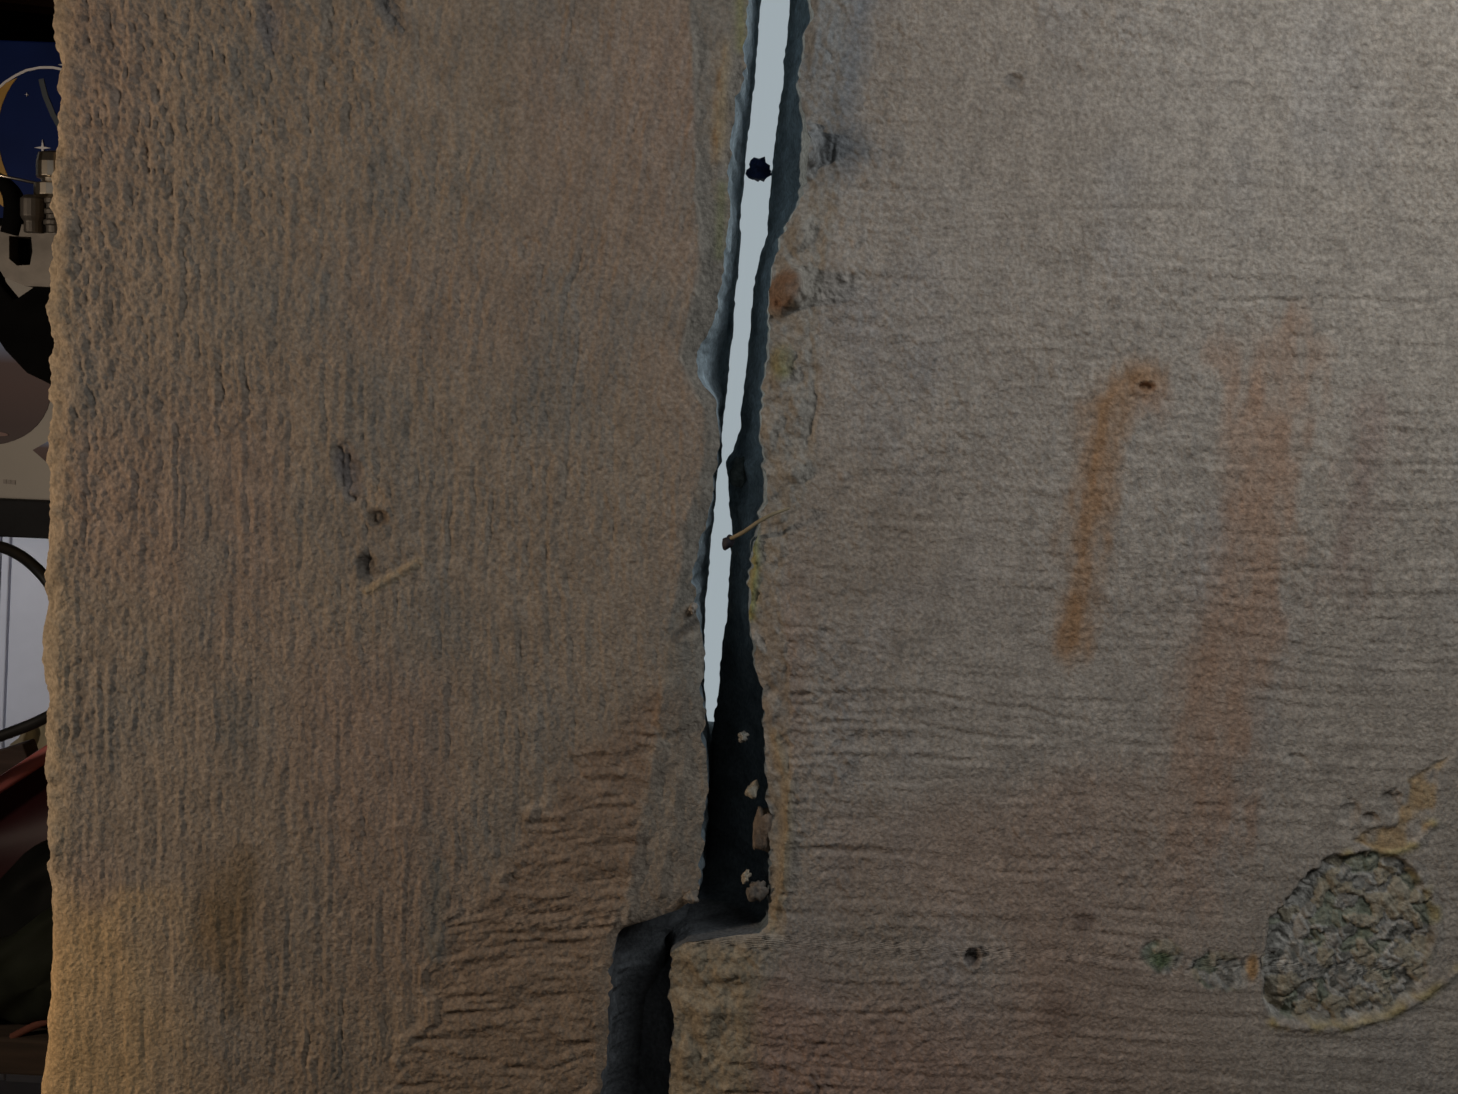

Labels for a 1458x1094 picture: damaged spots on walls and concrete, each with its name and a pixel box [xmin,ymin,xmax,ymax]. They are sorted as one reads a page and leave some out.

crack [600,0,840,1094]
spalling [1130,750,1458,1037]